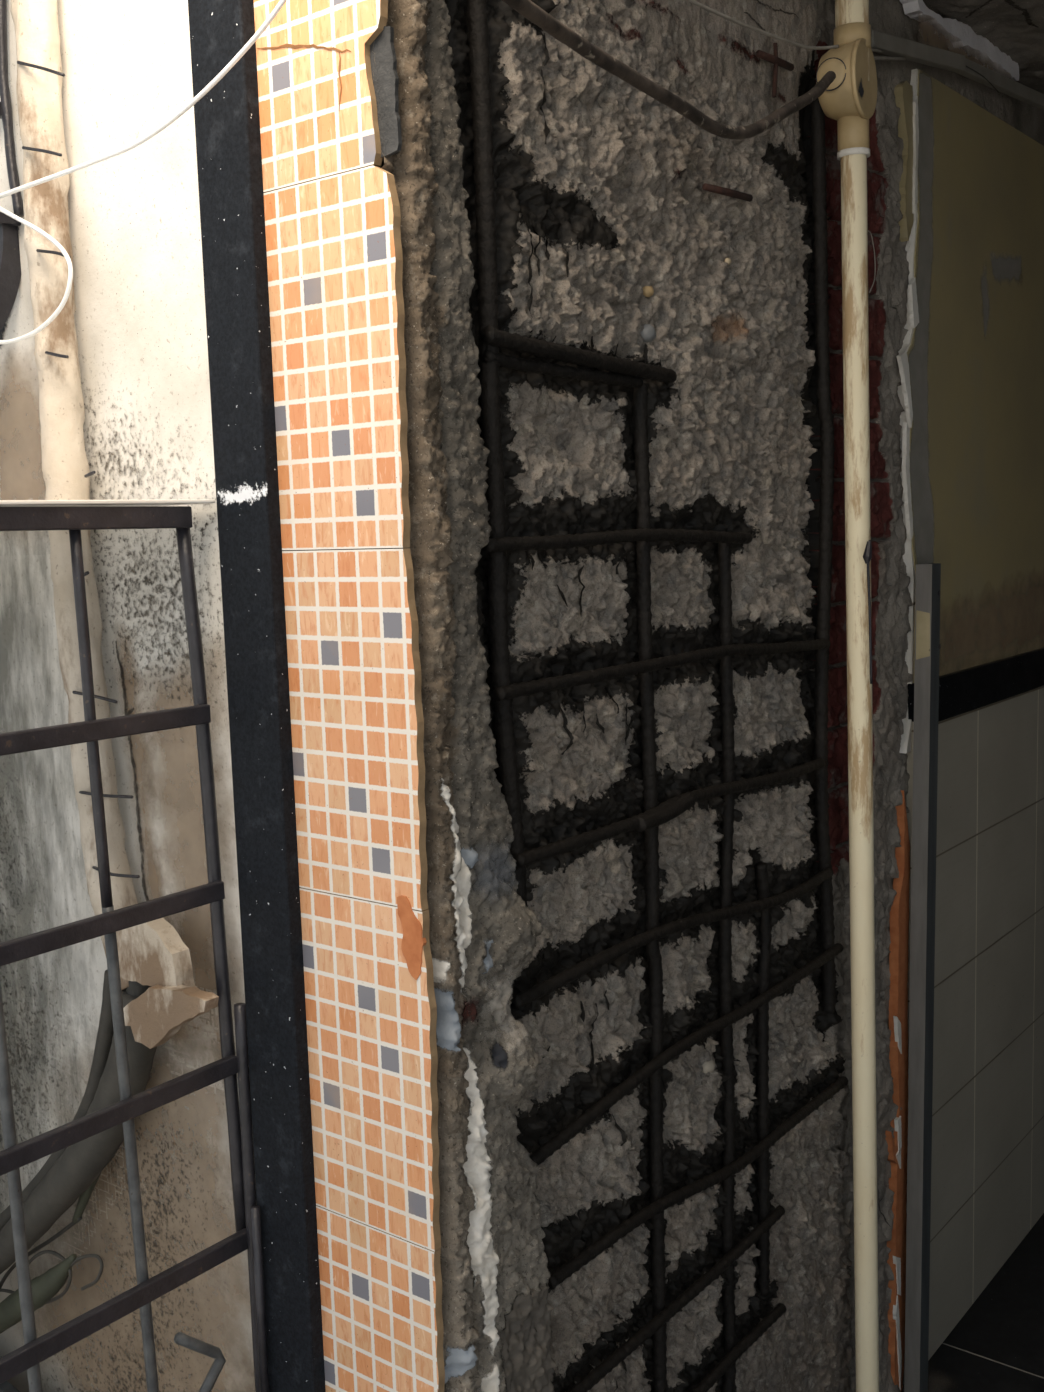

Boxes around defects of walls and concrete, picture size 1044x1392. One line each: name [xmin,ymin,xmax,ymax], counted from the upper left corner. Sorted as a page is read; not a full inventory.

spalling [381,0,856,1392]
crack [744,0,797,31]
flaking render [867,0,1044,1392]